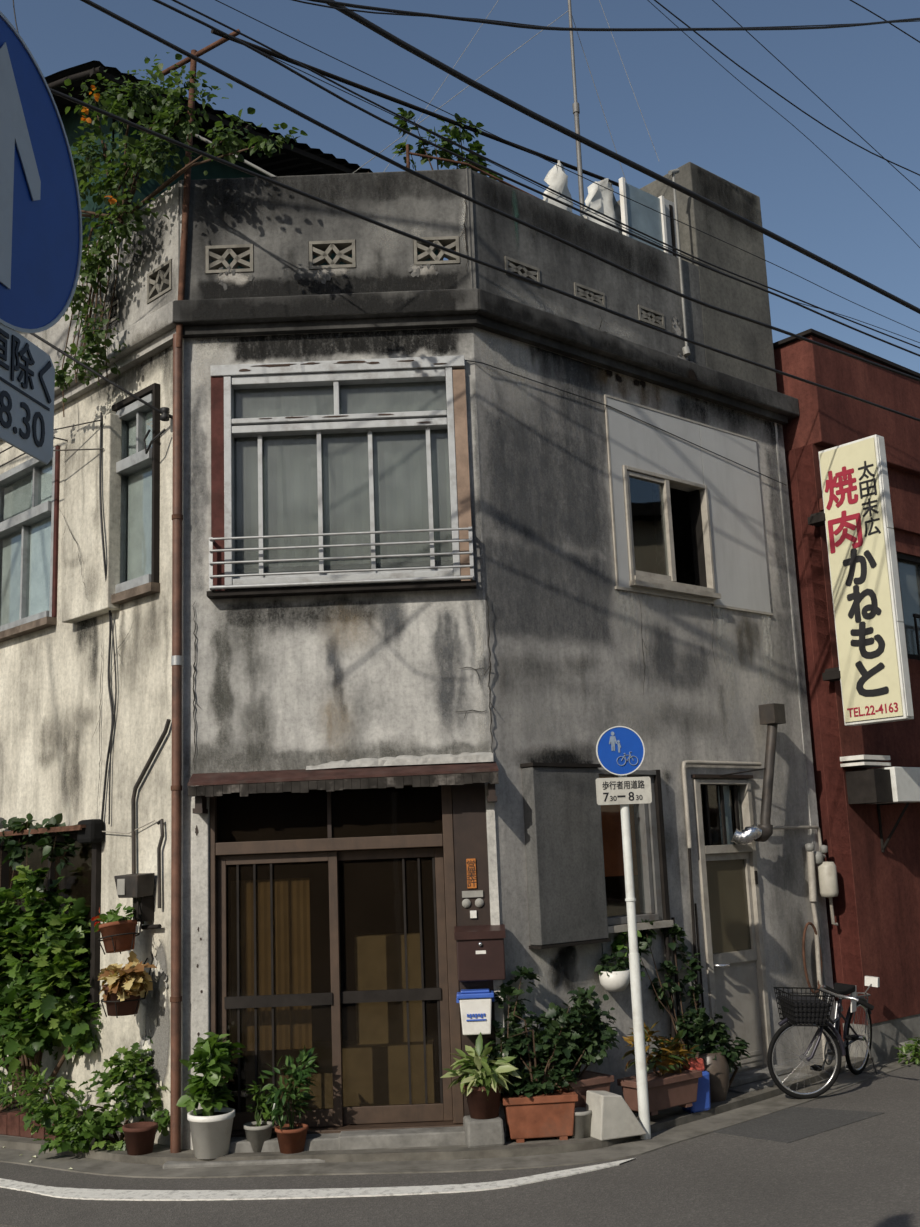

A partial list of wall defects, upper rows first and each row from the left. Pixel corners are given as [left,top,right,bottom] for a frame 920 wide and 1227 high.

damp [698,167,755,220]
damp [468,347,636,672]
damp [190,597,487,774]